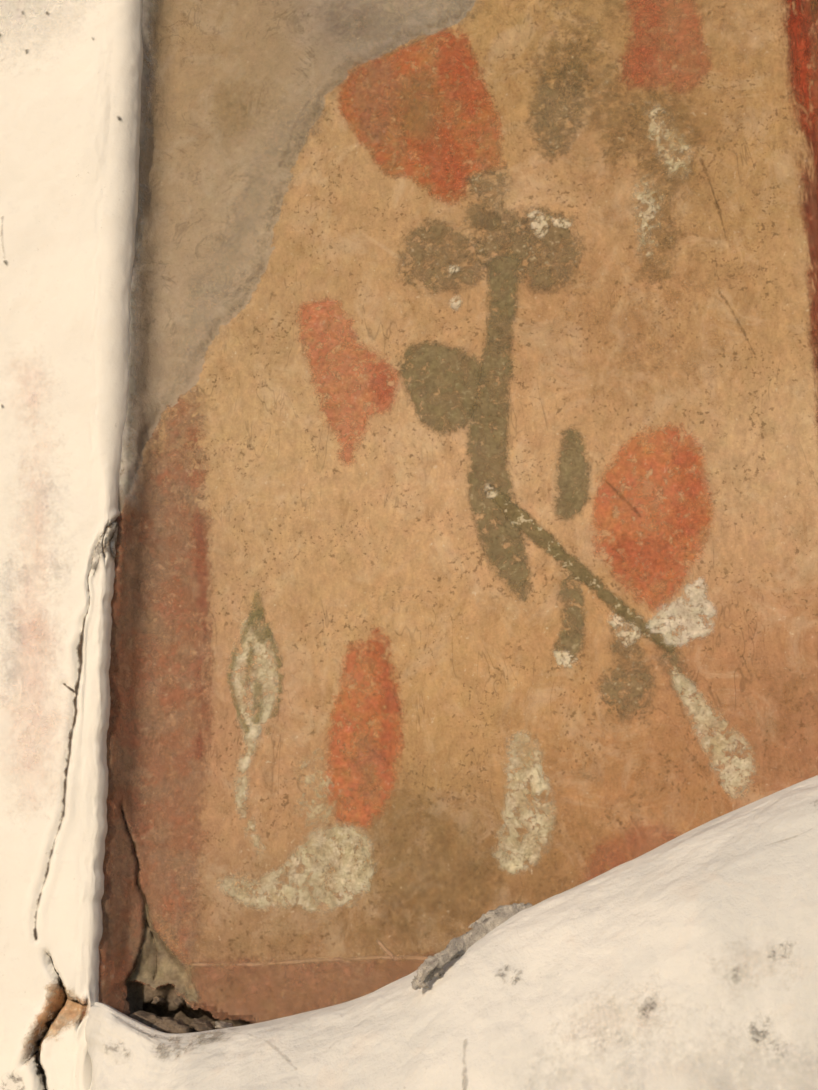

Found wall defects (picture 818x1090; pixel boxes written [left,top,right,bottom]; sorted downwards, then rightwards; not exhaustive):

peeling [528,211,572,237]
crack [27,520,119,1090]
crack [121,809,157,979]
flaking render [99,904,199,1003]